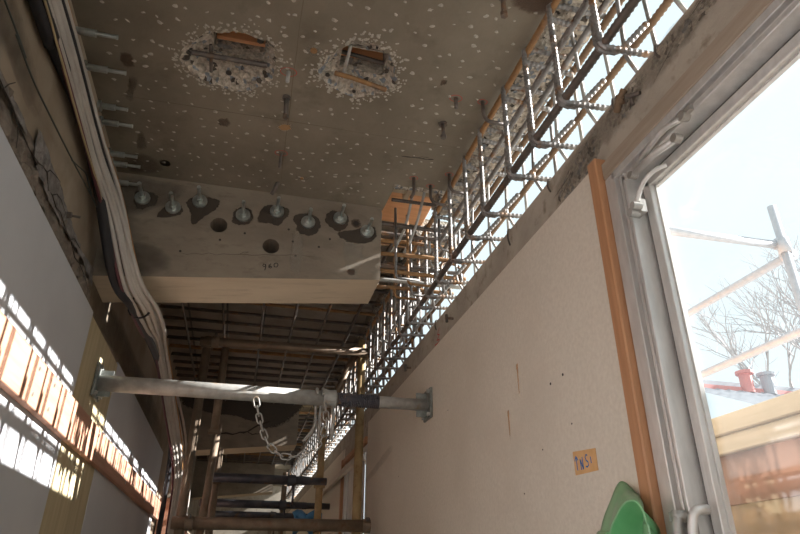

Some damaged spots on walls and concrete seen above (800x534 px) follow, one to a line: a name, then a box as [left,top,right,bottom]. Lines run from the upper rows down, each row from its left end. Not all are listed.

spalling [132,12,293,113]